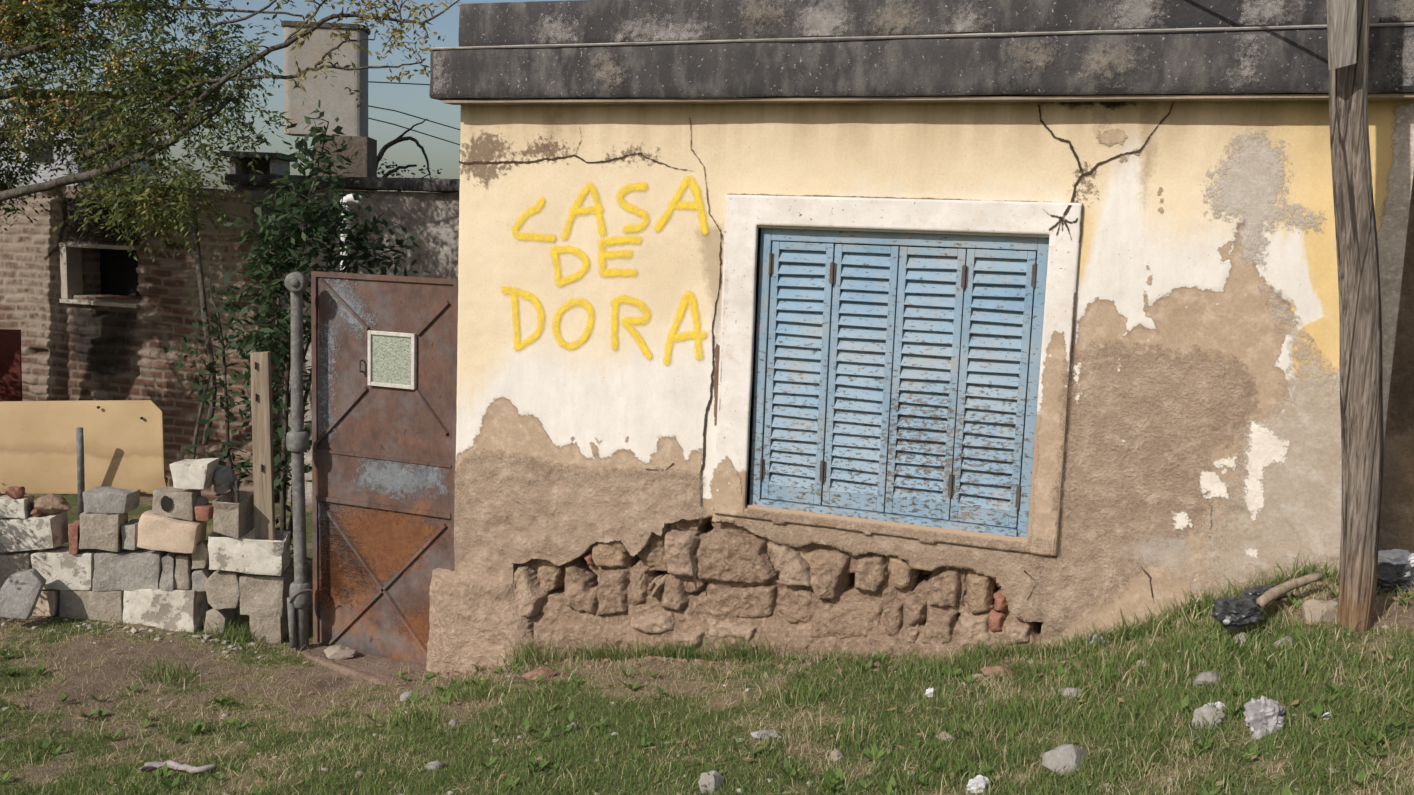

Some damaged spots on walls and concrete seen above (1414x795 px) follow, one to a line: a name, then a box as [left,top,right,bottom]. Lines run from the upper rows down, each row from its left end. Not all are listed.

leakage [539,18,576,40]
leakage [593,22,707,84]
leakage [740,0,784,21]
leakage [802,2,844,36]
leakage [870,0,918,35]
leakage [947,13,983,32]
leakage [1085,0,1159,77]
leakage [1241,0,1284,76]
spalling [1096,129,1141,162]
crack [459,102,1174,589]
flaking render [354,221,1340,659]
corrosion [398,604,430,644]